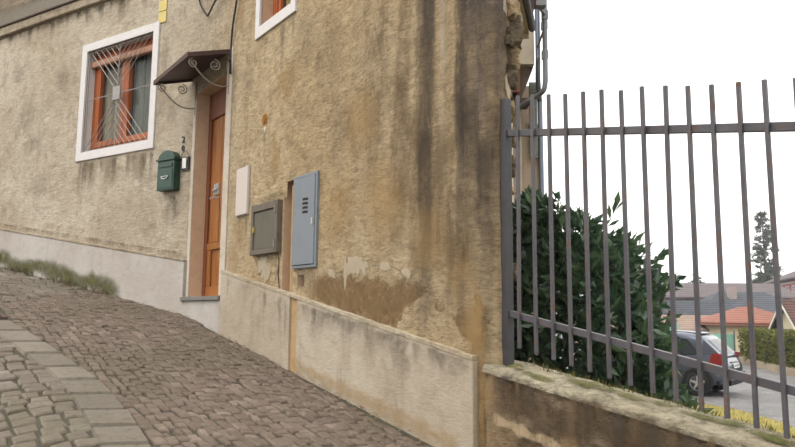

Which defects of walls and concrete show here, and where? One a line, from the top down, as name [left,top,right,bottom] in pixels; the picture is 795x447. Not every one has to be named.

spalling [503,0,525,195]
flaking render [313,256,423,328]
flaking render [452,293,487,356]